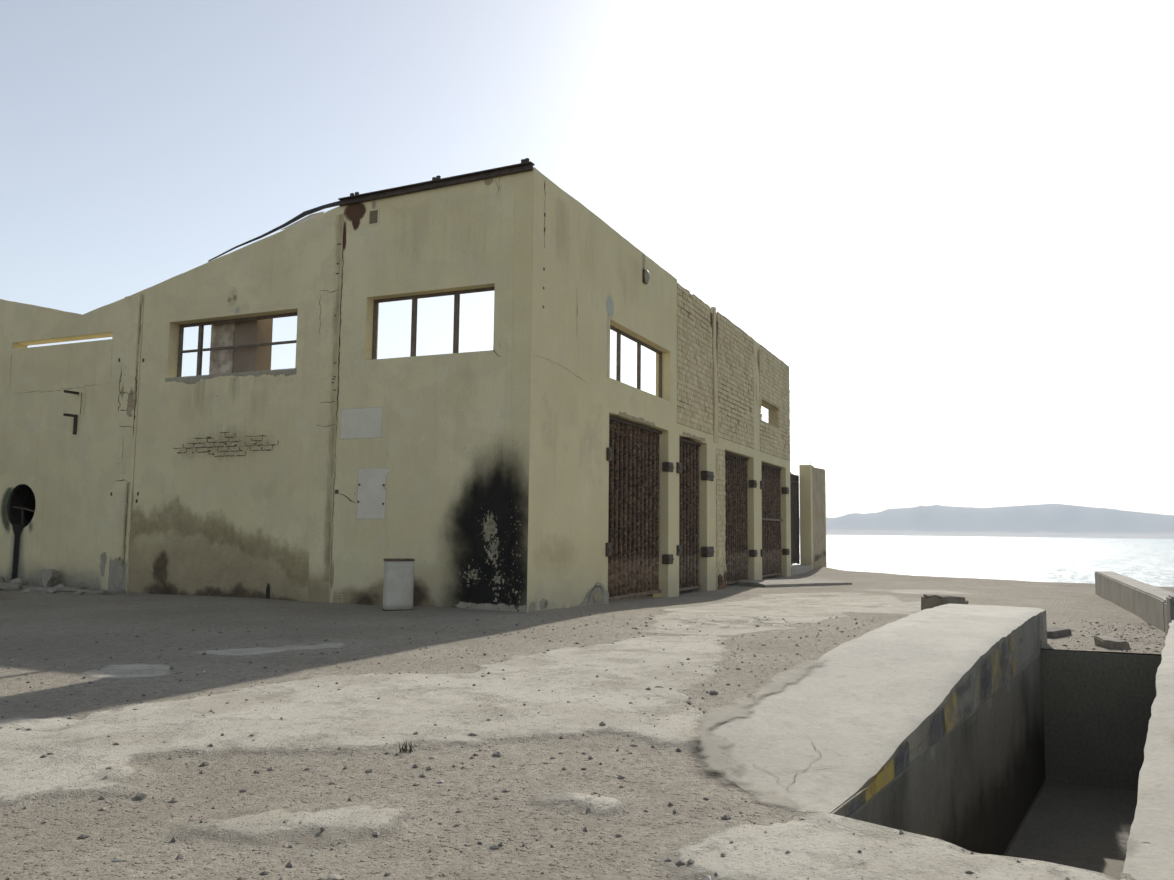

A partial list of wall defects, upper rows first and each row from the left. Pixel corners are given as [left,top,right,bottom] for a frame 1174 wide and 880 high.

corrosion [343,203,366,249]
damp [128,550,383,605]
damp [413,586,433,607]
spalling [846,649,1162,880]